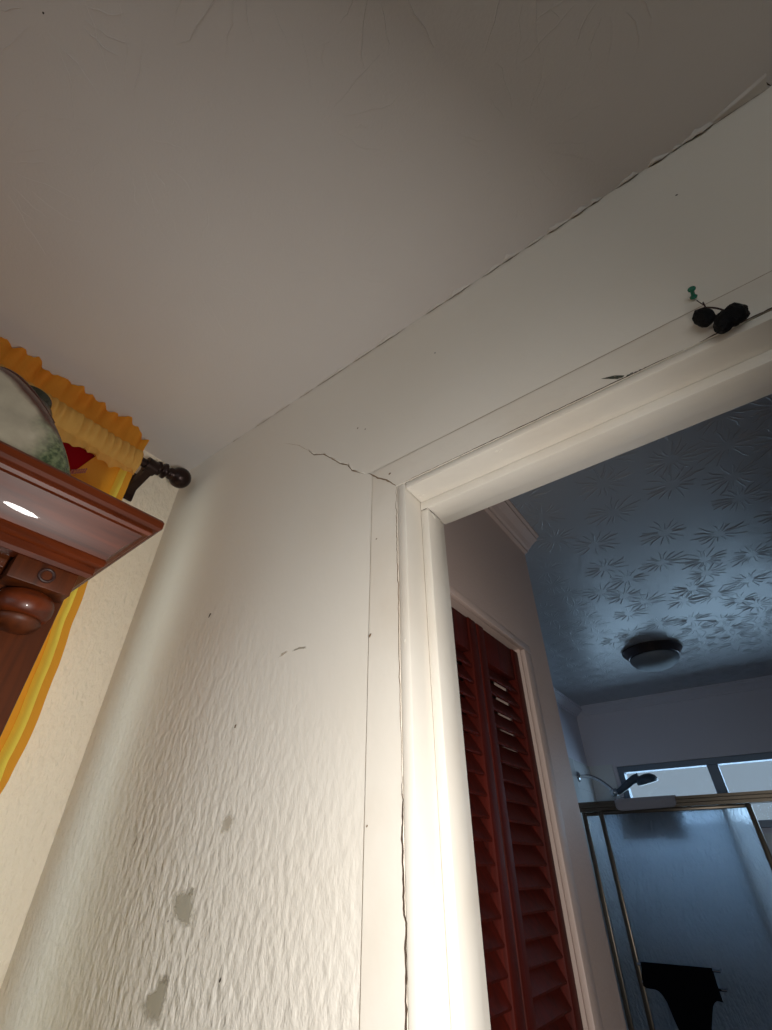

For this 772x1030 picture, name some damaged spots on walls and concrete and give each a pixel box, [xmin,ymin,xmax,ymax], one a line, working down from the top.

crack [292,271,771,634]
crack [360,724,368,952]
crack [399,660,408,1030]